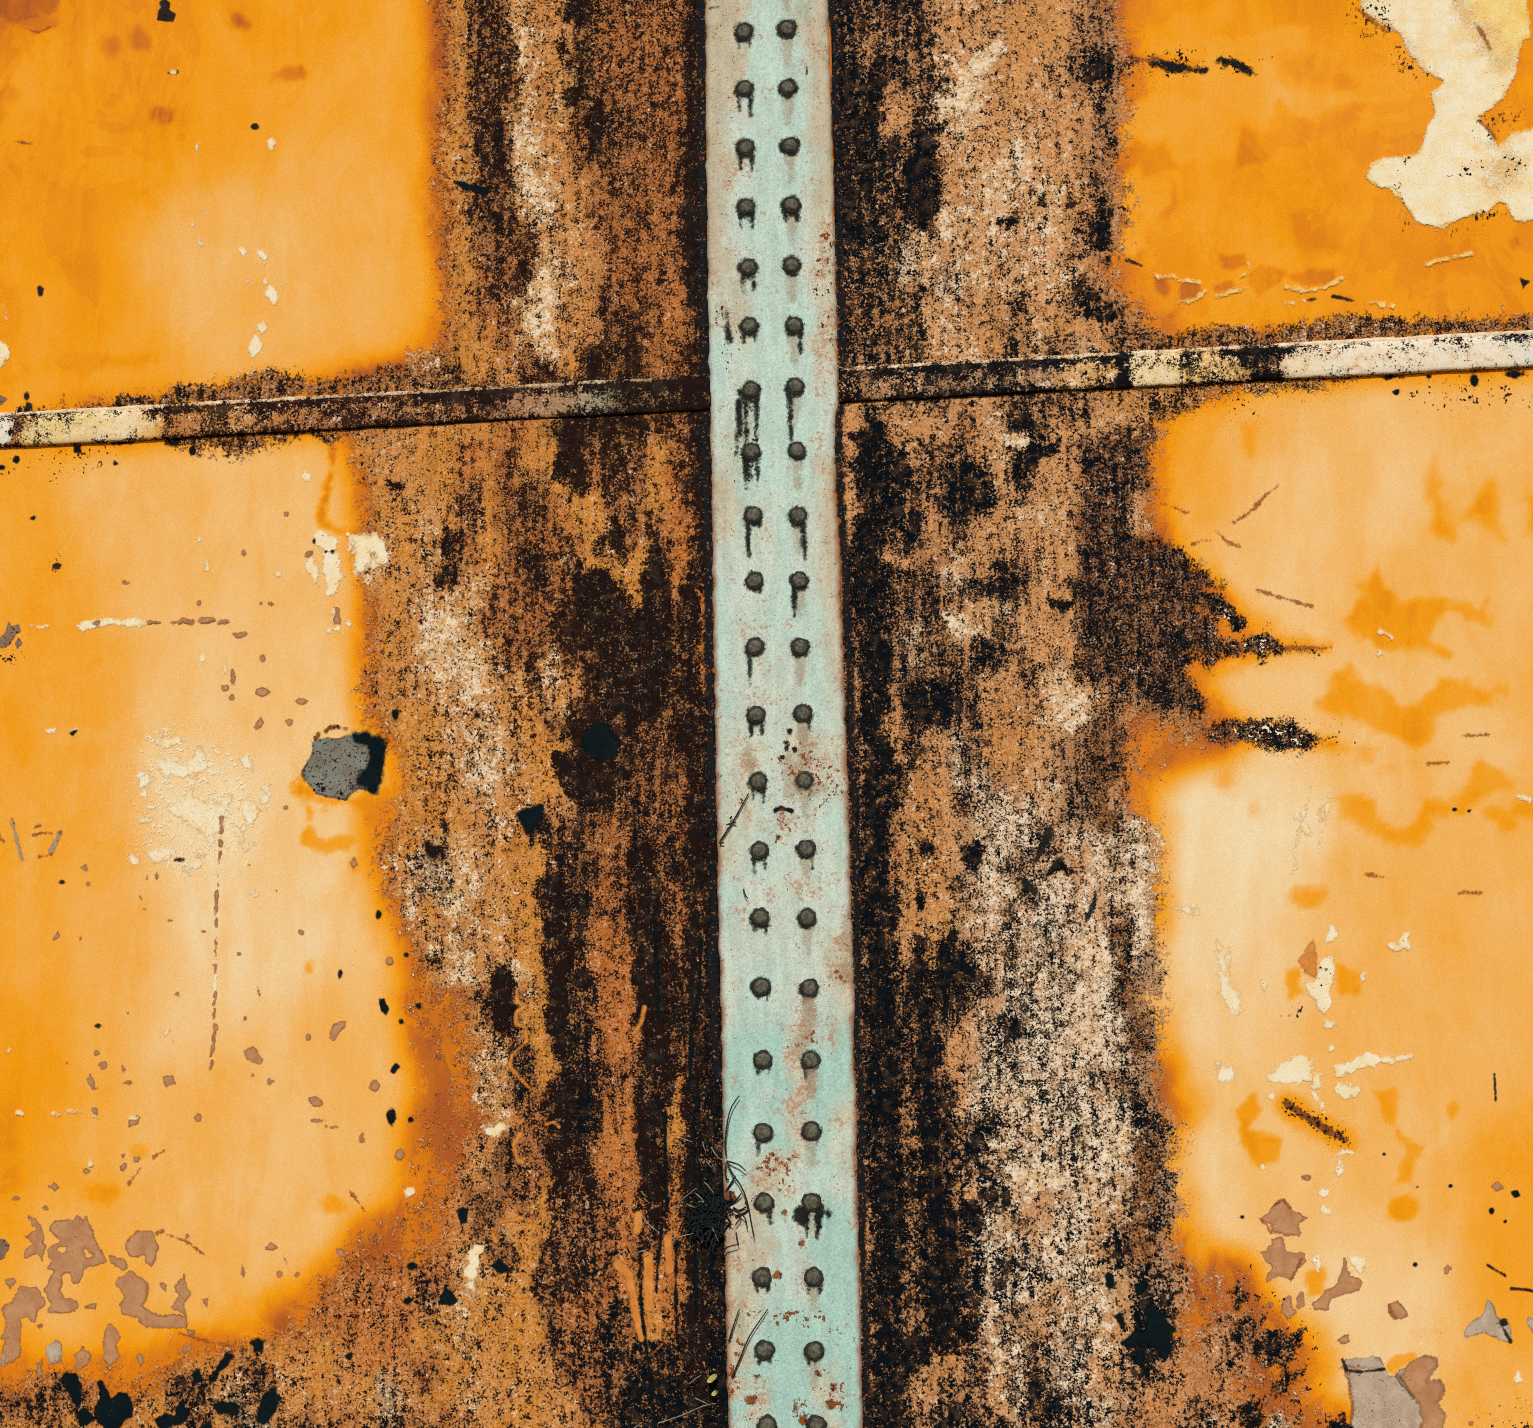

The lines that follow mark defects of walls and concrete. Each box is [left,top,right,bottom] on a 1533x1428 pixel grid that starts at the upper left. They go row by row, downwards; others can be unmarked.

rust [0,0,70,44]
rust [15,0,760,412]
peeling [1345,0,1533,236]
rust [744,0,1533,1428]
peeling [11,617,414,1188]
rust [0,381,773,1428]
peeling [1261,924,1413,1120]
peeling [0,1182,281,1428]
peeling [438,1244,509,1305]
peeling [1240,1149,1367,1319]
peeling [1338,1334,1446,1428]
peeling [1464,1300,1533,1343]